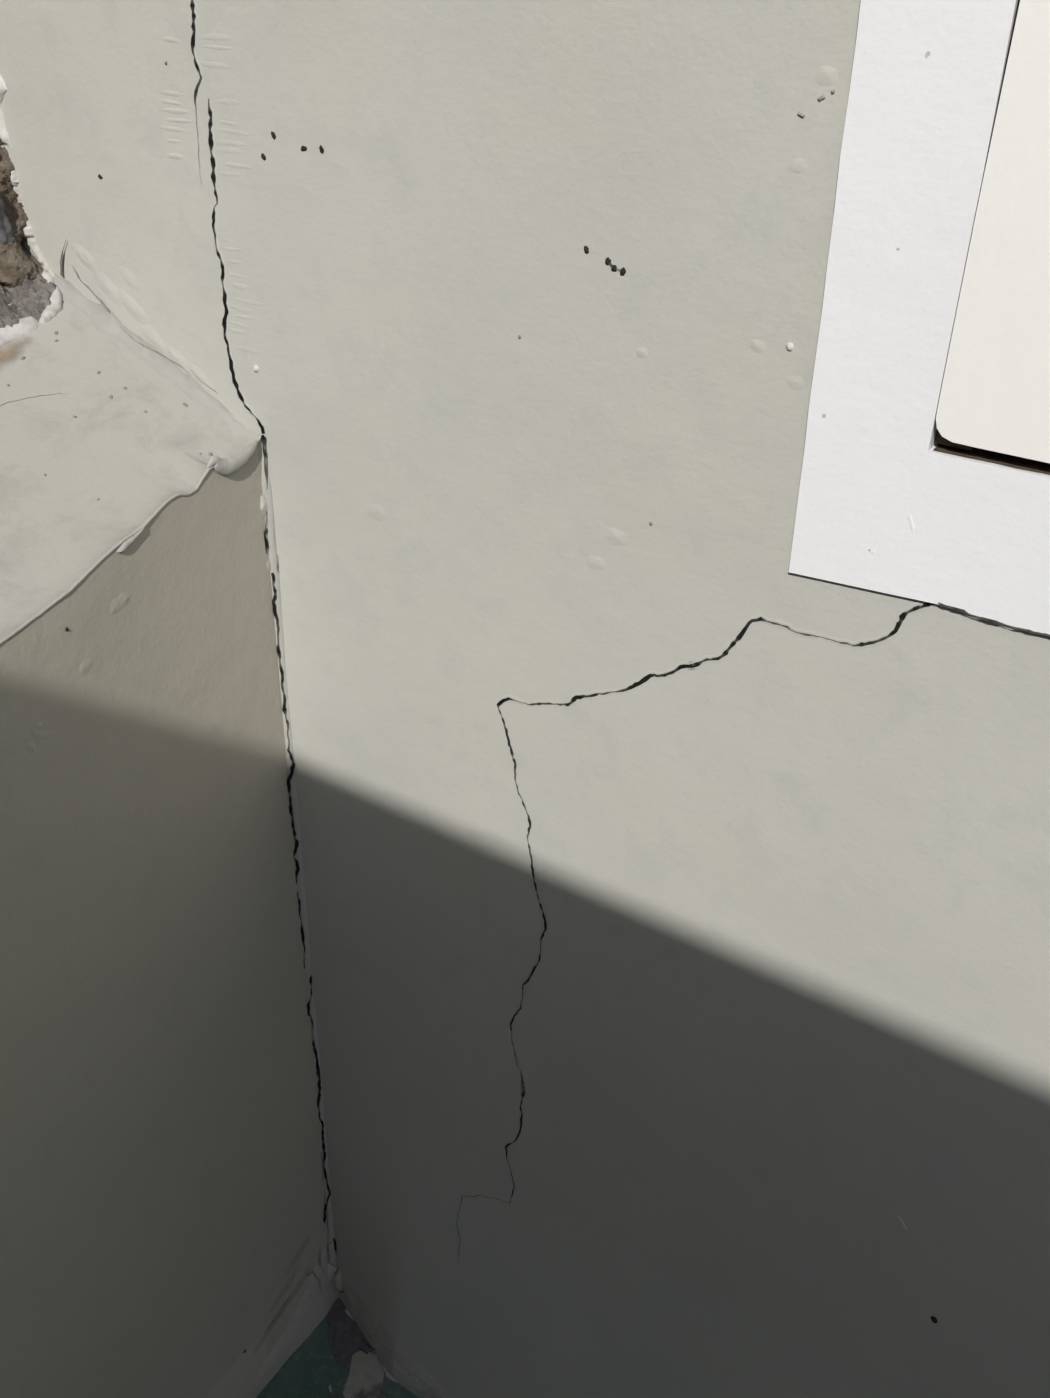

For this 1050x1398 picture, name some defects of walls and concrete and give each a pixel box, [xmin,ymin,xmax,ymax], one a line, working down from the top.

spalling [0,75,64,348]
crack [60,0,337,1251]
crack [456,601,1050,1261]